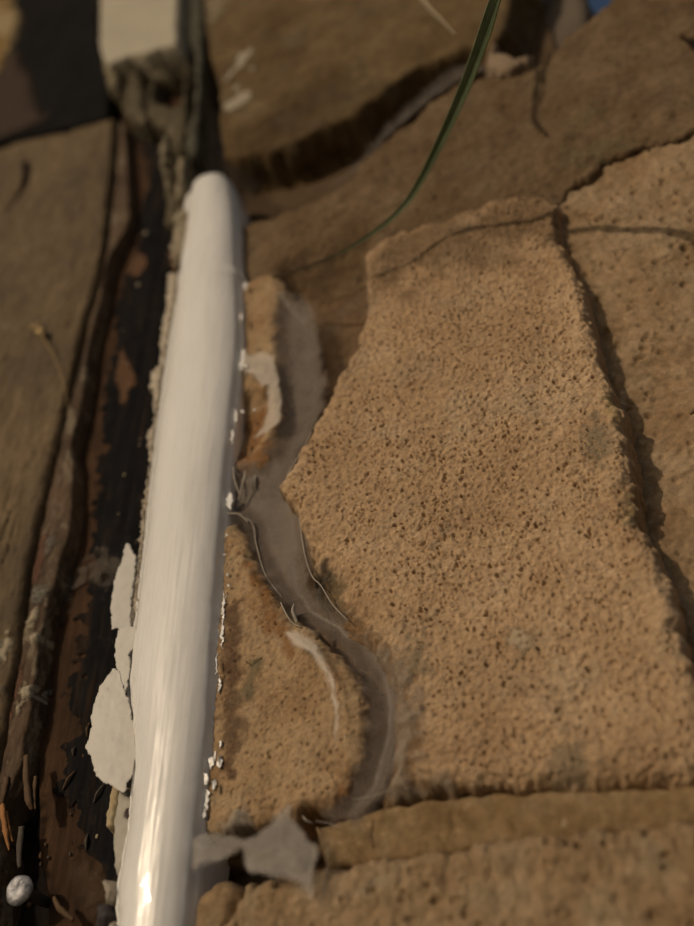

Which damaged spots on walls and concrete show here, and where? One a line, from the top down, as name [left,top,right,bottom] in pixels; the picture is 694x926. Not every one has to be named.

peeling [212,99,228,177]
peeling [52,135,178,917]
water stain [314,560,334,612]
water stain [221,601,245,779]